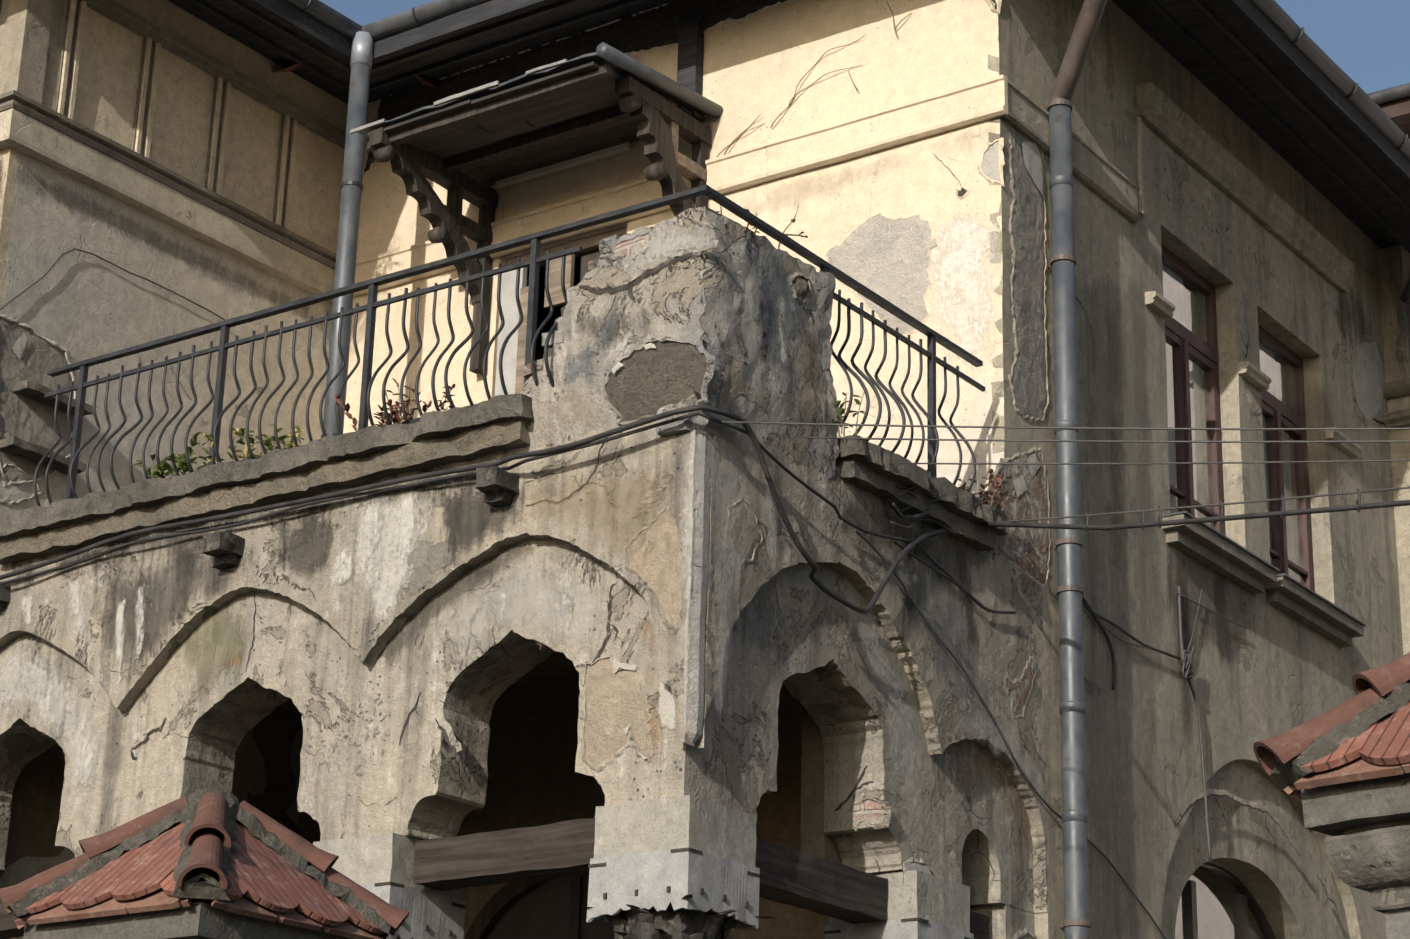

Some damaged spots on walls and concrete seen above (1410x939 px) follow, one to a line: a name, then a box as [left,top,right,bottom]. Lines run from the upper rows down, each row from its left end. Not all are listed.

flaking render [375,0,829,121]
flaking render [983,0,1002,14]
spalling [787,272,812,305]
peeling [825,209,939,338]
peeling [0,315,77,508]
spalling [603,335,715,426]
water stain [116,578,148,681]
water stain [13,514,252,639]
water stain [278,504,326,568]
water stain [332,460,523,619]
crack [586,581,618,666]
flaking render [984,447,1052,589]